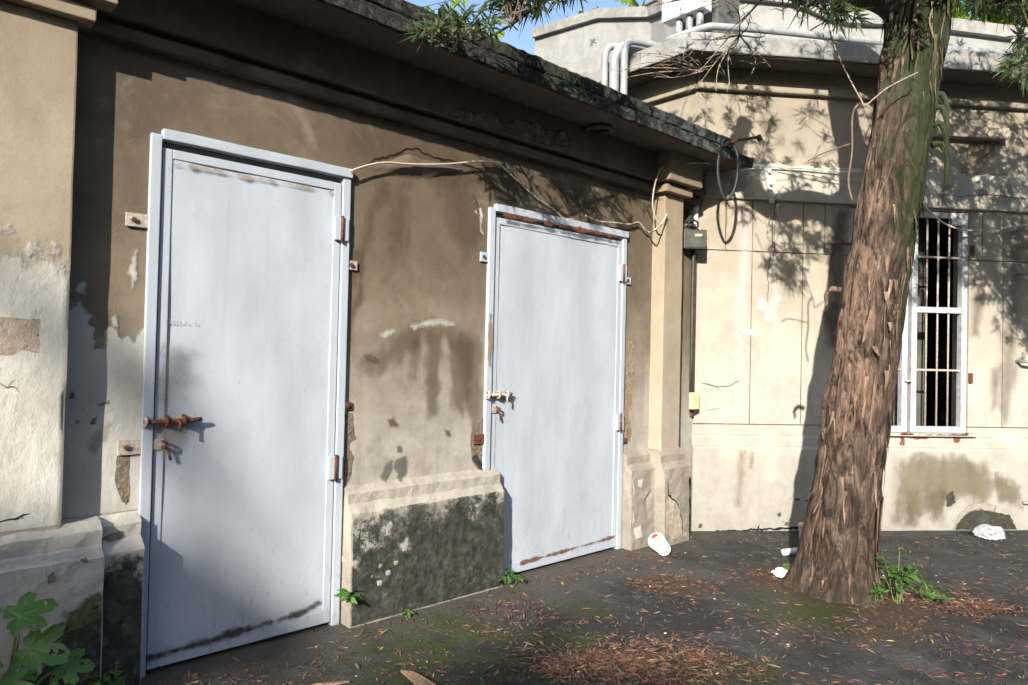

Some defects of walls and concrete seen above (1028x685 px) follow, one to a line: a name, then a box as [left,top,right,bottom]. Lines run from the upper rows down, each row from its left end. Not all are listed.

corrosion [503,212,618,238]
peeling [0,241,144,532]
damp [381,446,406,482]
damp [897,458,1018,523]
spalling [102,531,123,542]
mould [351,492,504,627]
corrosion [520,535,614,565]
peeling [632,511,643,539]
spalling [666,496,702,539]
mould [22,555,143,685]